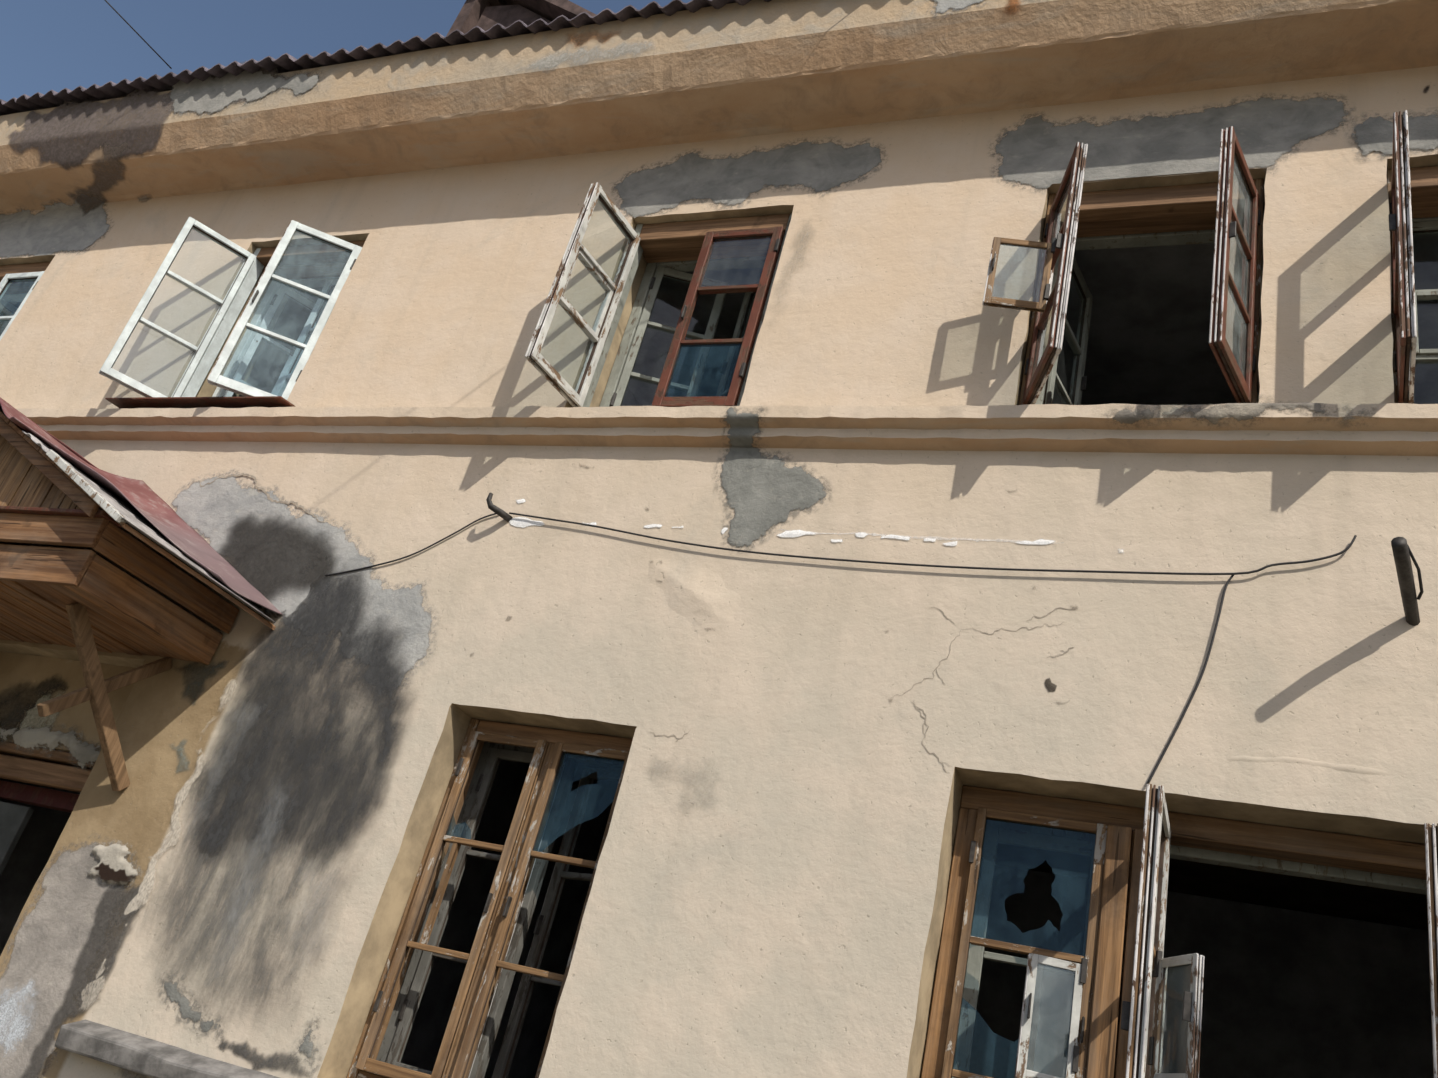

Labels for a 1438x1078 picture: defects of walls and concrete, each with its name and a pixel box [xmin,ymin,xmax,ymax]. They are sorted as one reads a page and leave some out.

rust [1007,0,1019,13]
water stain [181,662,224,704]
flaking render [220,680,236,707]
crack [891,607,1074,773]
water stain [169,751,342,999]
flaking render [82,959,106,1007]